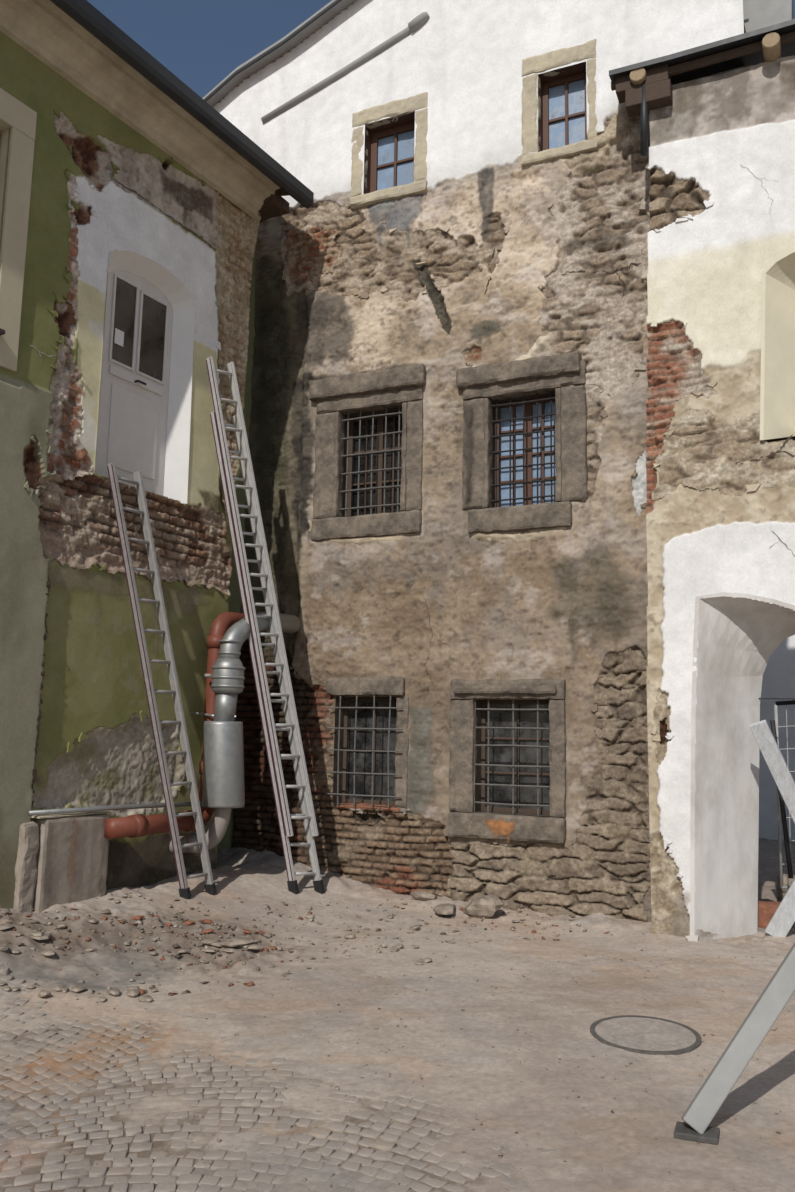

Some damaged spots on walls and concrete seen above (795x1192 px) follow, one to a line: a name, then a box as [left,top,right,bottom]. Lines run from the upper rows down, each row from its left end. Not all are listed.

spalling [23,108,261,600]
spalling [277,200,510,334]
spalling [462,346,482,366]
spalling [538,113,795,515]
peeling [32,711,186,817]
spalling [233,636,699,941]
rust [487,820,514,835]